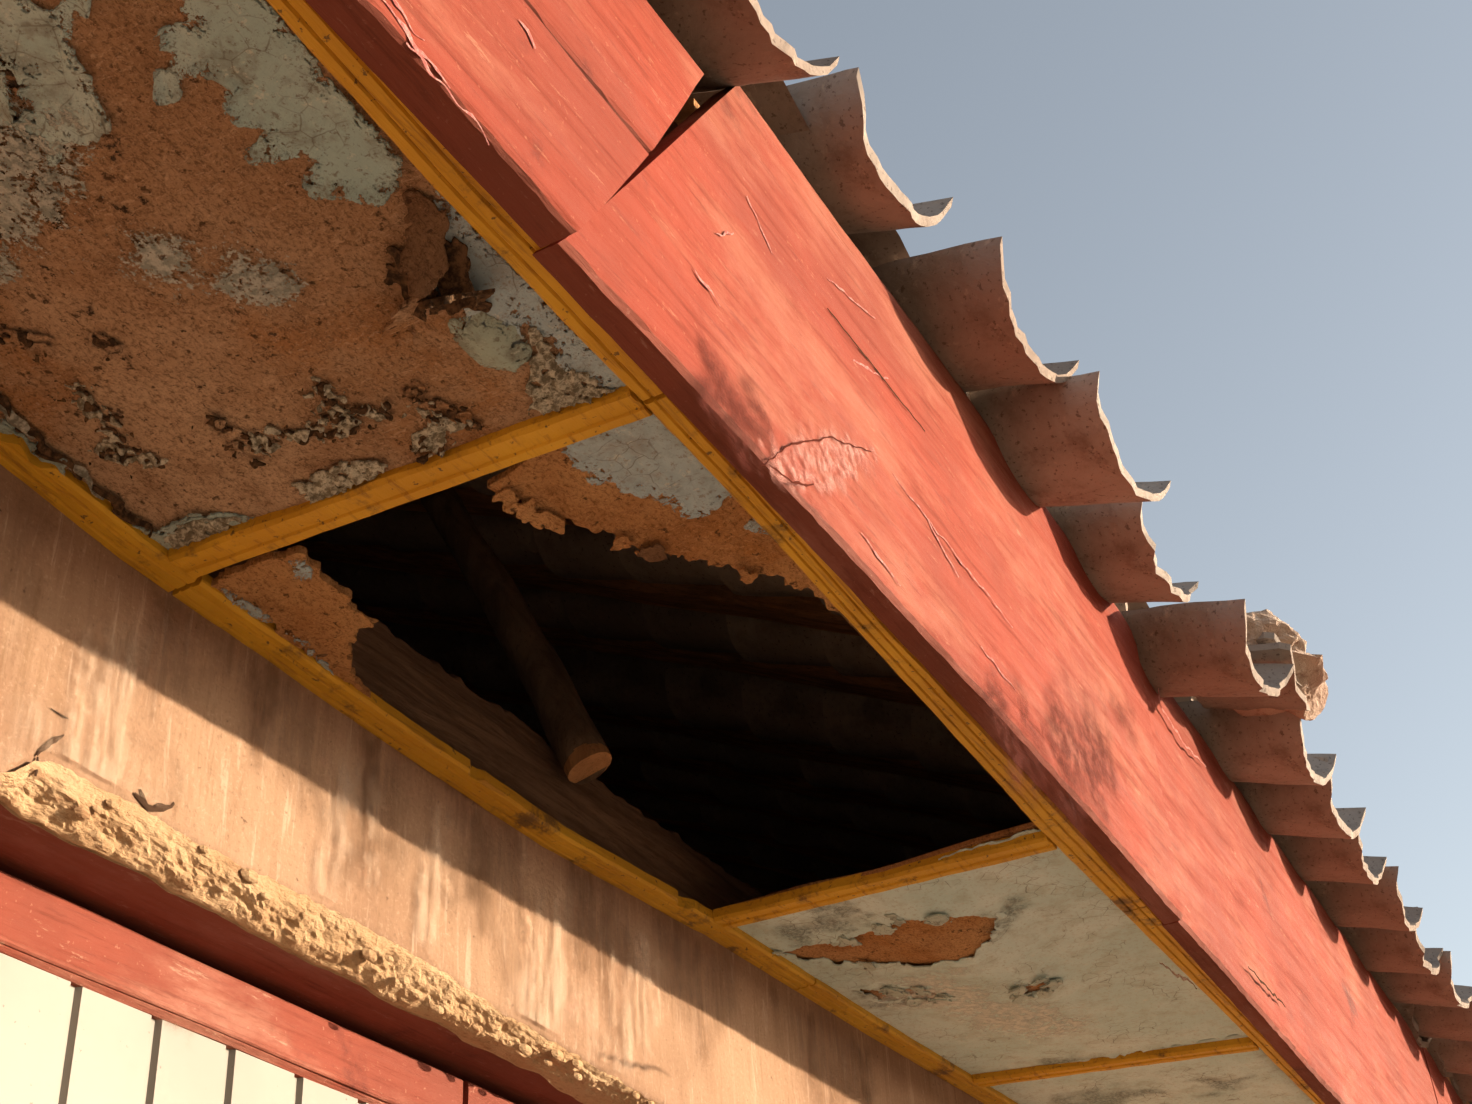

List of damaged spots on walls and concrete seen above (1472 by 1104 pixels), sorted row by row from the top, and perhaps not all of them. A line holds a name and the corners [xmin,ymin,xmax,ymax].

peeling [0,0,616,549]
peeling [776,440,863,489]
peeling [738,566,758,584]
peeling [356,611,379,630]
peeling [772,914,997,1006]